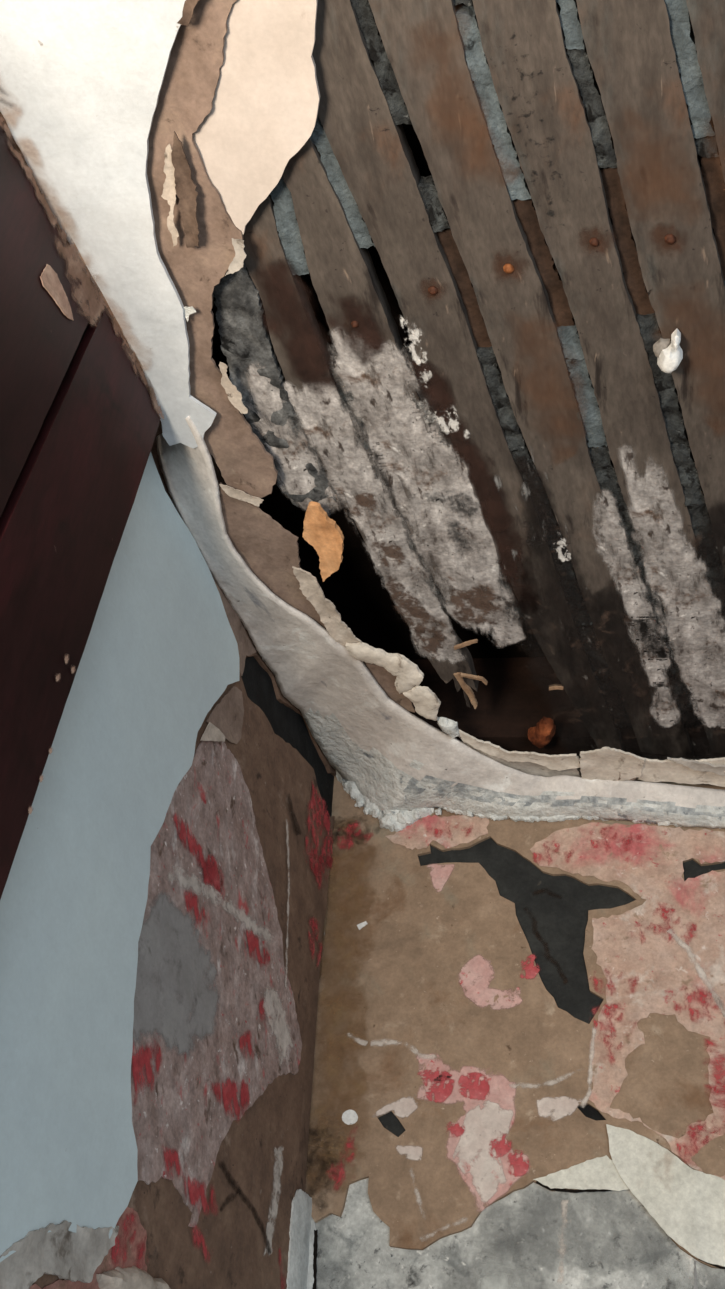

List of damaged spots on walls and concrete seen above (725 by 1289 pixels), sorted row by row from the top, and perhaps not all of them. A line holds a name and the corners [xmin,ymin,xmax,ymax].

peeling [0,116,164,419]
peeling [147,0,725,787]
damp [246,260,725,760]
peeling [0,1206,171,1289]
peeling [131,722,302,1261]
peeling [279,1189,316,1289]
peeling [305,784,725,1267]